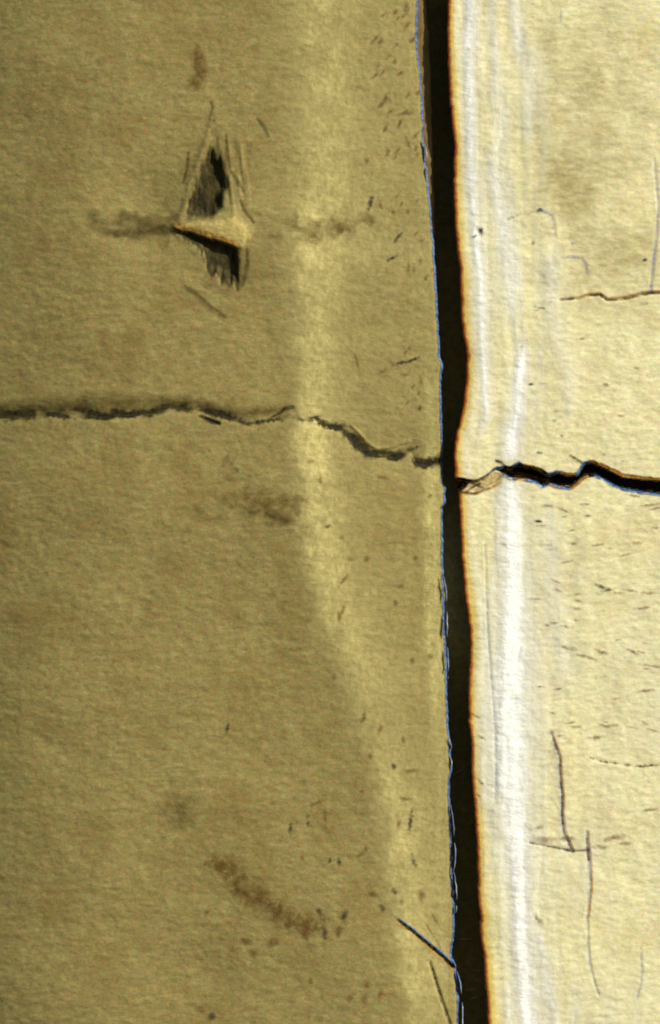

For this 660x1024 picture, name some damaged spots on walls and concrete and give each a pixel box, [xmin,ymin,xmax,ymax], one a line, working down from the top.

spalling [188,147,225,216]
spalling [175,231,238,290]
crack [561,254,660,301]
crack [0,399,660,495]